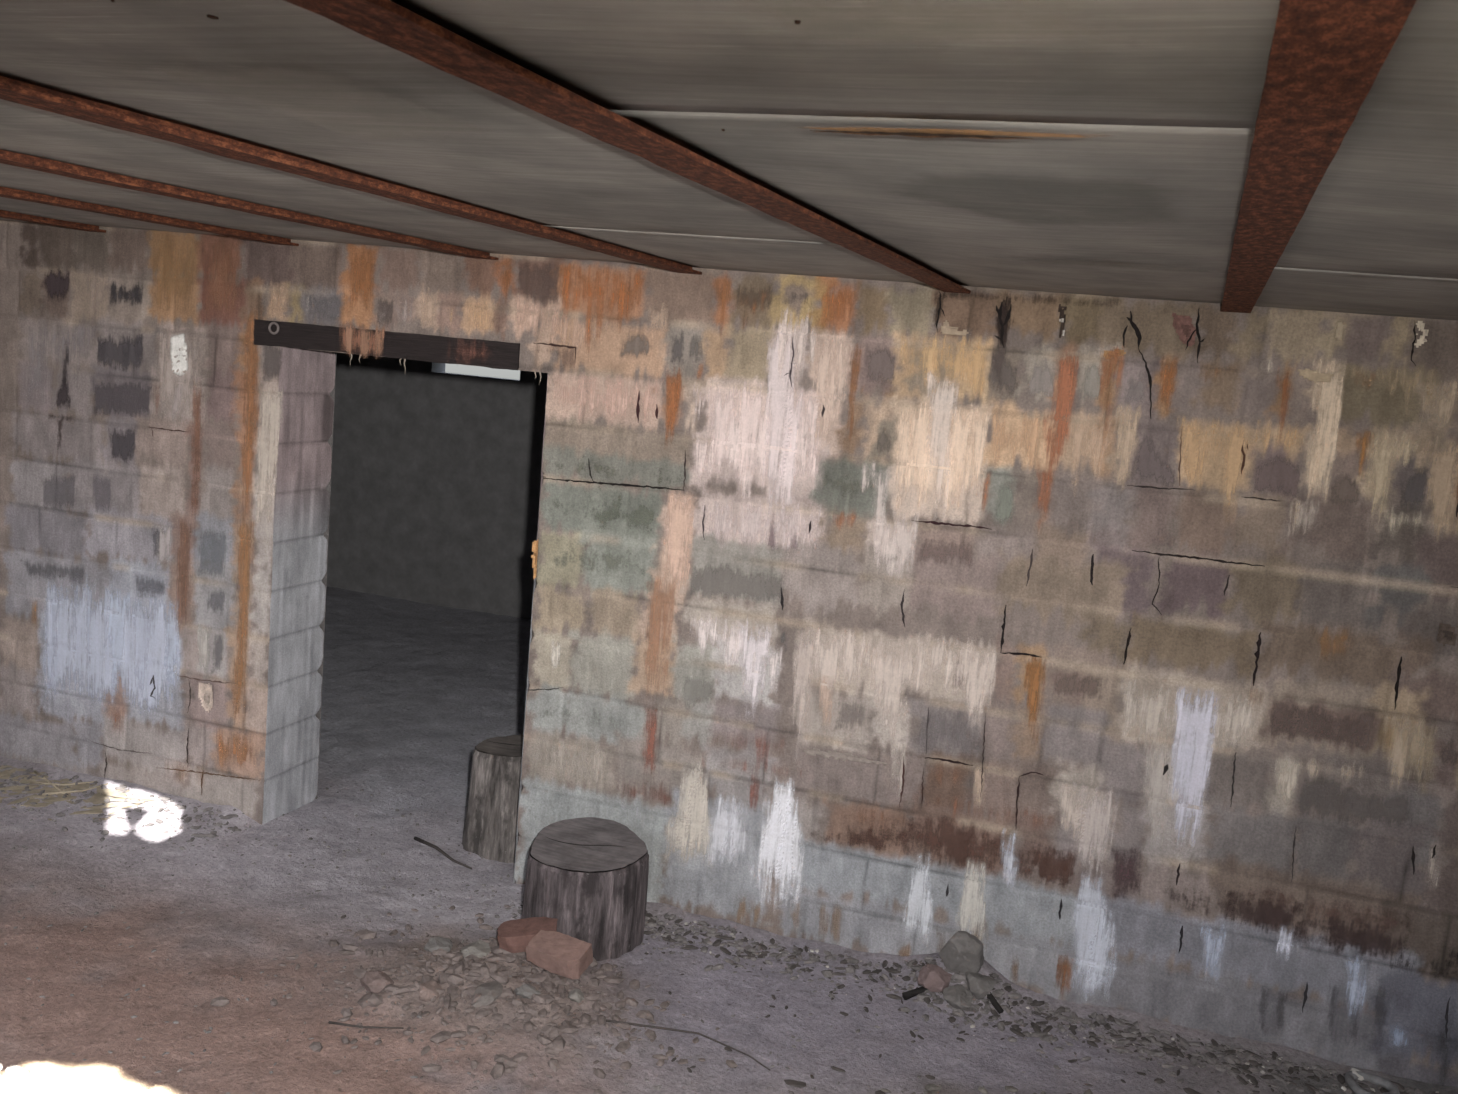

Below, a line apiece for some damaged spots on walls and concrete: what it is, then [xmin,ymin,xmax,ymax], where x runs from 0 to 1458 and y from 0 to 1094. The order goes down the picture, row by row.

rust [243,318,259,495]
crack [1123,311,1193,490]
crack [1185,309,1205,363]
rust [177,524,188,620]
rust [234,528,249,709]
water stain [668,765,813,902]
water stain [975,769,983,804]
water stain [838,786,1140,992]
water stain [1124,687,1253,838]
water stain [1171,891,1409,1015]
water stain [1271,704,1374,748]
water stain [1278,724,1458,825]